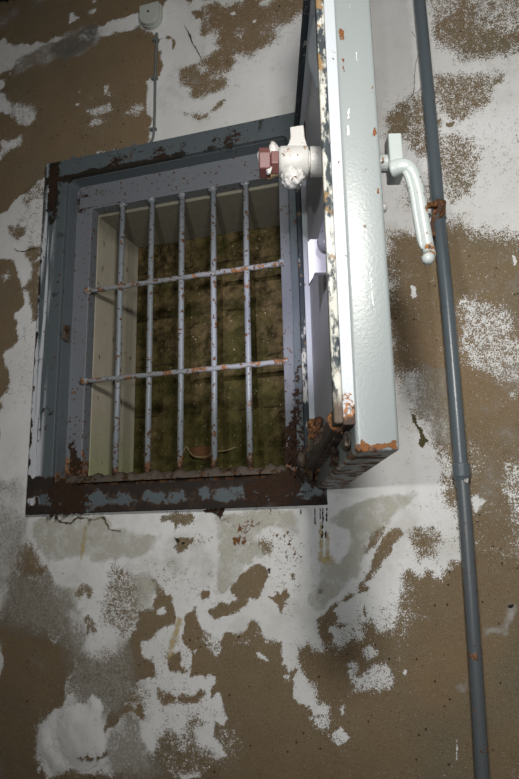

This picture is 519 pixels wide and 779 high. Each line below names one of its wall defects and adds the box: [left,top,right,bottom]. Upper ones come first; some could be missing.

peeling [172,0,303,123]
peeling [0,0,176,411]
peeling [373,77,431,203]
corrosion [41,431,94,557]
peeling [0,181,475,779]
corrosion [232,519,260,552]
corrosion [236,360,351,513]
peeling [426,0,519,779]